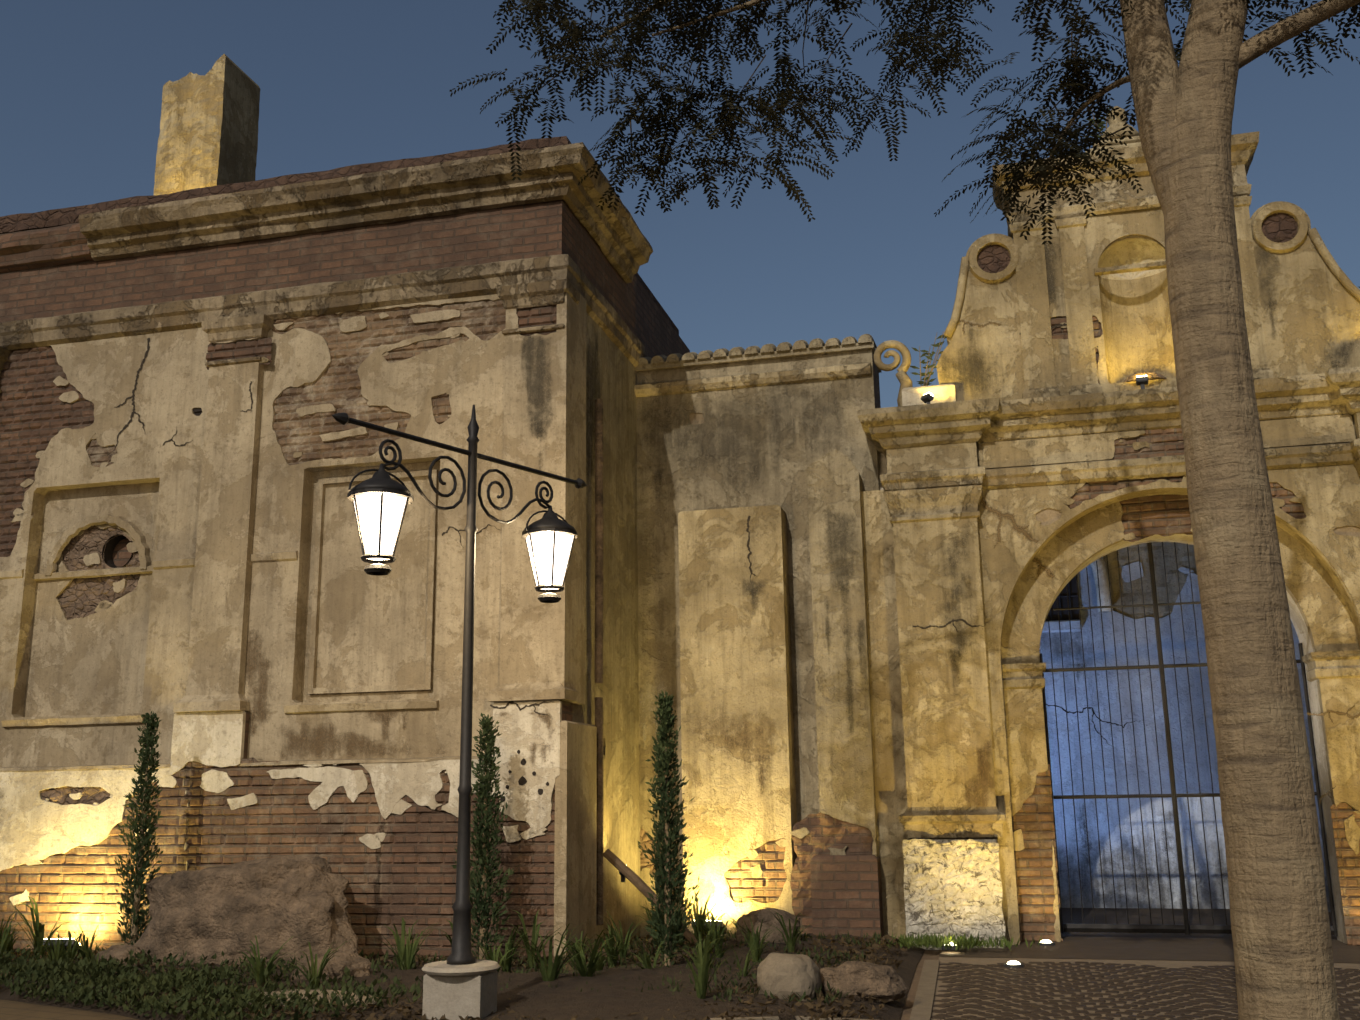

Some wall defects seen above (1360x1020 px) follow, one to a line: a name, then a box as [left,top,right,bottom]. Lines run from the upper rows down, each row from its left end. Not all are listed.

flaking render [0,346,119,557]
spalling [58,526,140,620]
crack [107,338,193,456]
flaking render [206,300,557,465]
leakage [522,336,546,435]
crack [746,516,756,584]
flaking render [1062,475,1193,542]
flaking render [1111,428,1185,460]
flaking render [0,750,555,963]
spalling [724,812,873,934]
flaking render [1012,764,1063,942]
flaking render [1330,802,1360,945]